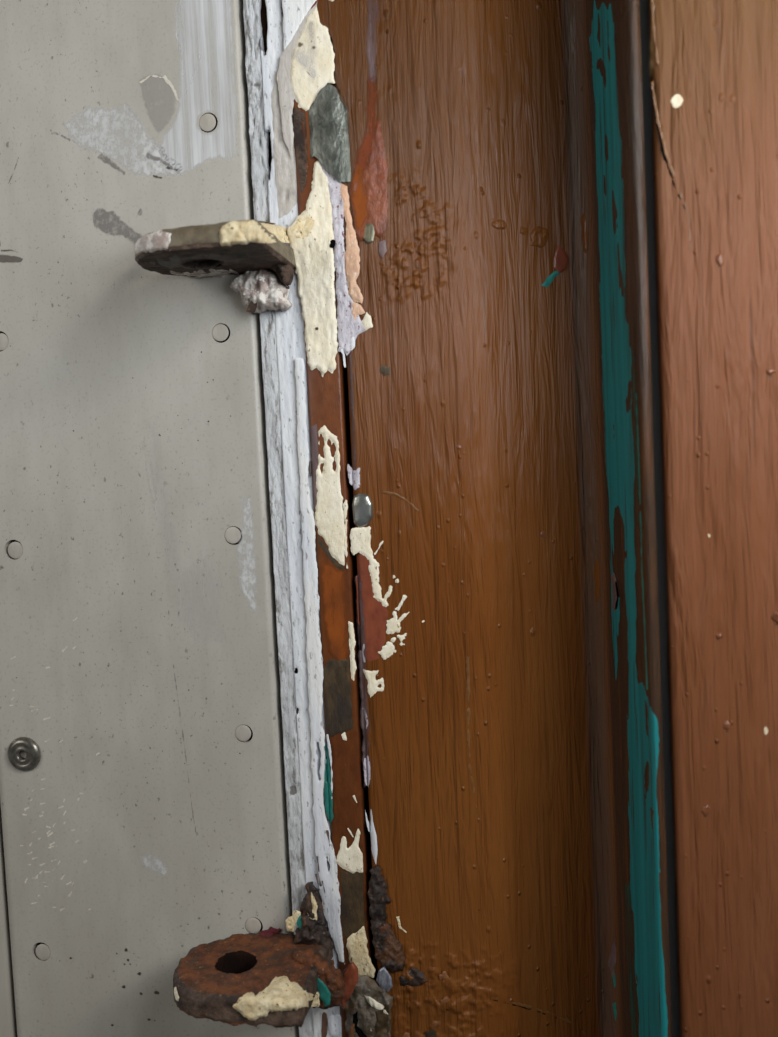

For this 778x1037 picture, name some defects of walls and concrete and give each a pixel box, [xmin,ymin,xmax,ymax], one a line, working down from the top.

peeling [220,0,351,247]
peeling [351,302,373,331]
peeling [356,553,388,662]
peeling [323,659,353,737]
peeling [285,892,318,932]
peeling [340,870,365,938]
peeling [233,976,367,1037]
peeling [376,967,393,992]